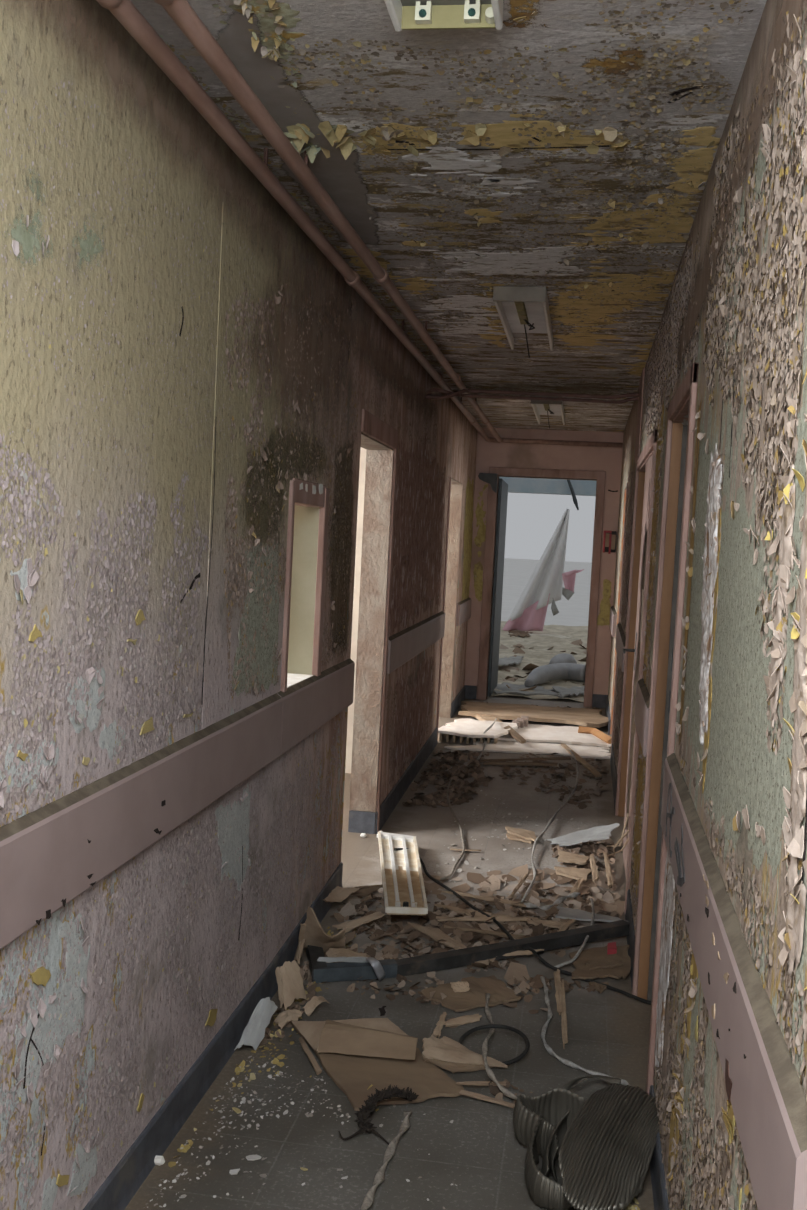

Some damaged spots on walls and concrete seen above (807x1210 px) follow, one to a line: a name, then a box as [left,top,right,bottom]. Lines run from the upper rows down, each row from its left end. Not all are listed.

peeling [159,0,807,1103]
peeling [168,1128,197,1168]
peeling [653,883,757,1210]